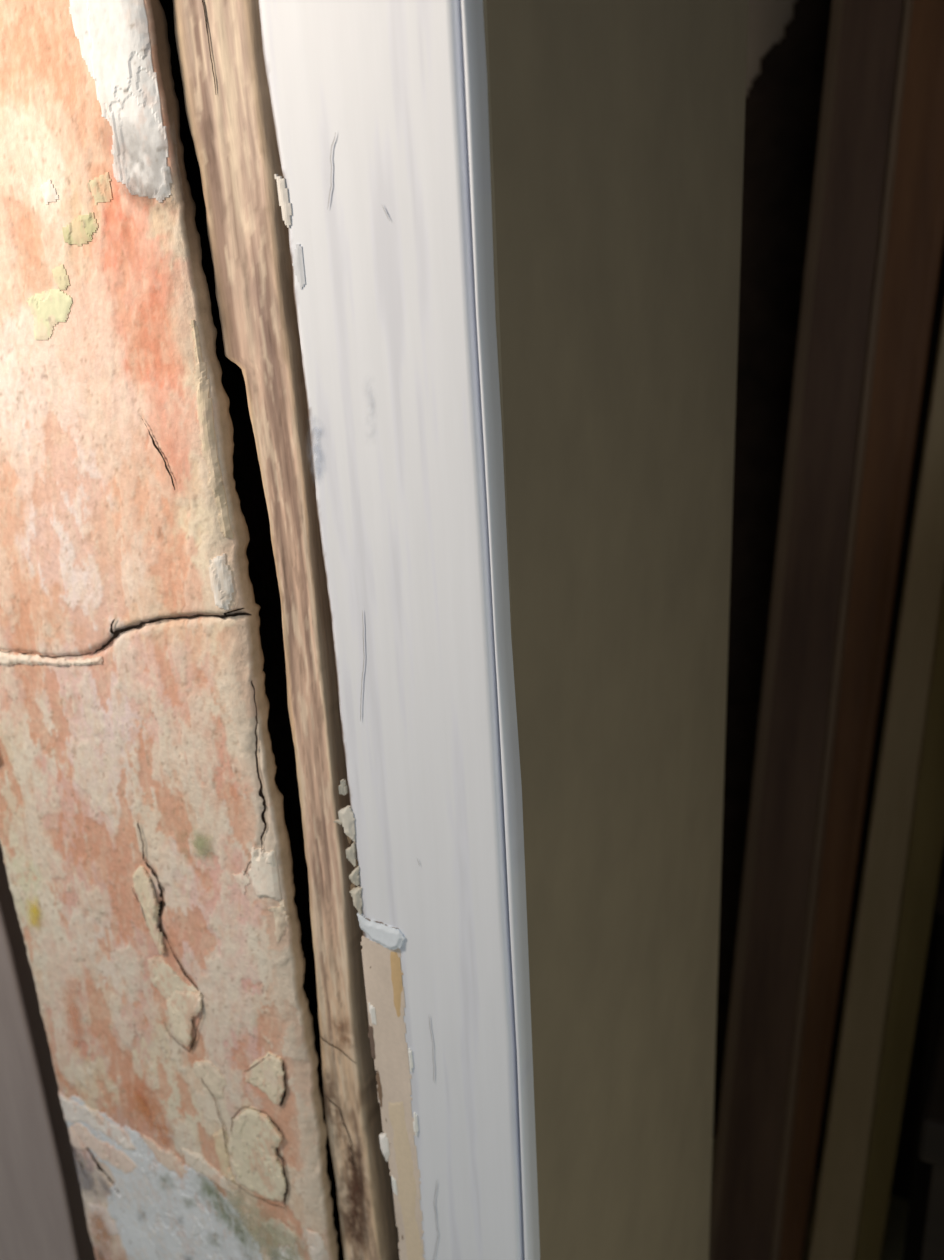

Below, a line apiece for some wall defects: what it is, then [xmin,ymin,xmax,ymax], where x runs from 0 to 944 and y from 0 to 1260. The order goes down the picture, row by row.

peeling [62,0,172,246]
peeling [274,174,292,228]
peeling [292,244,306,289]
spalling [189,320,234,539]
spalling [0,650,103,666]
crack [1,0,357,1260]
spalling [208,553,234,610]
peeling [132,866,203,1047]
spalling [233,847,289,942]
damp [73,1152,107,1191]
peeling [59,1052,330,1260]
peeling [361,936,425,1260]